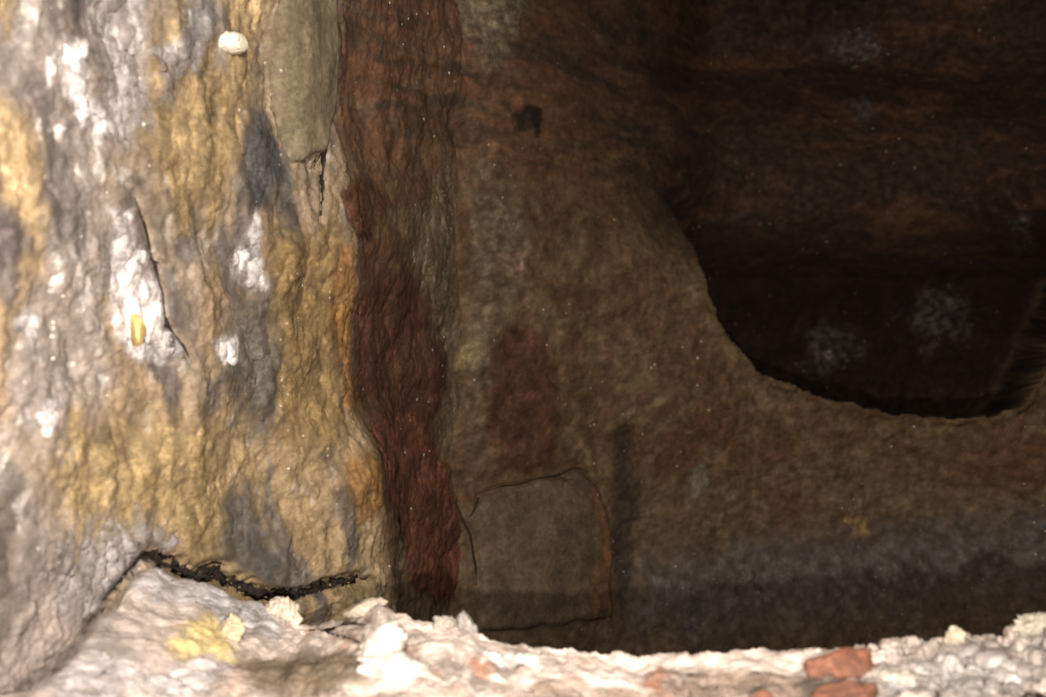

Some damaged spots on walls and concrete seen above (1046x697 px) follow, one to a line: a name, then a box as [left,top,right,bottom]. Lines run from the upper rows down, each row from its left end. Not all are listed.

crack [135,198,189,356]
crack [96,549,358,601]
crack [304,623,366,644]